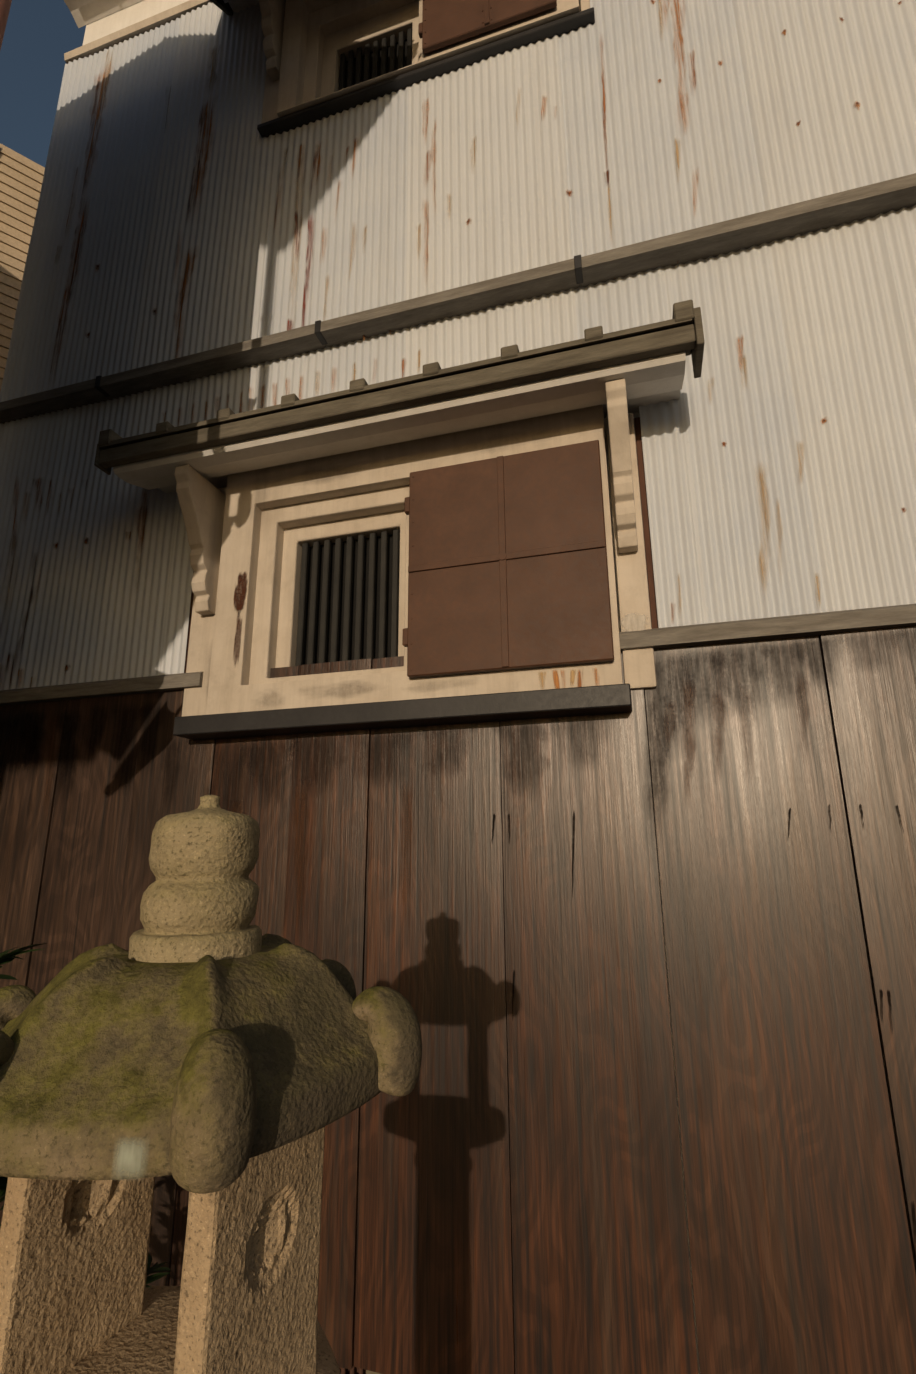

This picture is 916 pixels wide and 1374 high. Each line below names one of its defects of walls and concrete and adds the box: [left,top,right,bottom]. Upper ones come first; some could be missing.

rust [651,0,696,84]
rust [287,204,323,330]